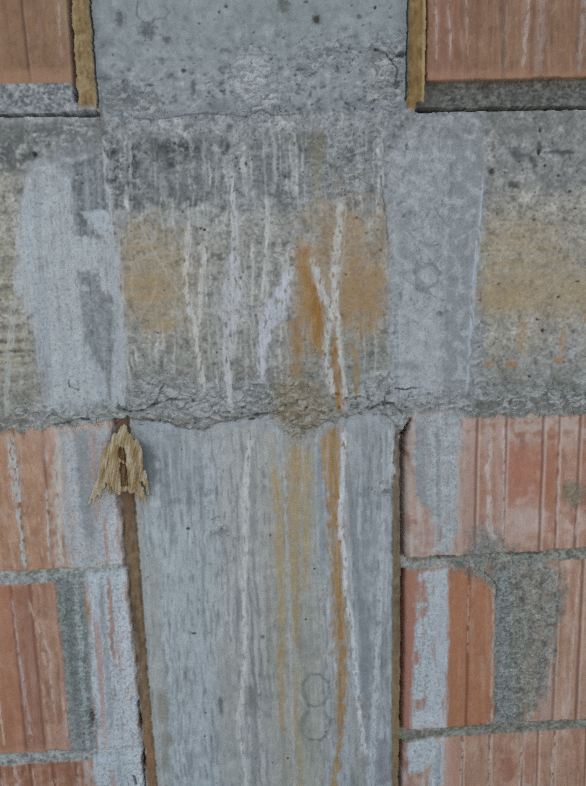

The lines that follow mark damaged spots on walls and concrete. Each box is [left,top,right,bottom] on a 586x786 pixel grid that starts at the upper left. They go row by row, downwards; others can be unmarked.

water stain [119,126,389,413]
corrosion [269,243,363,786]